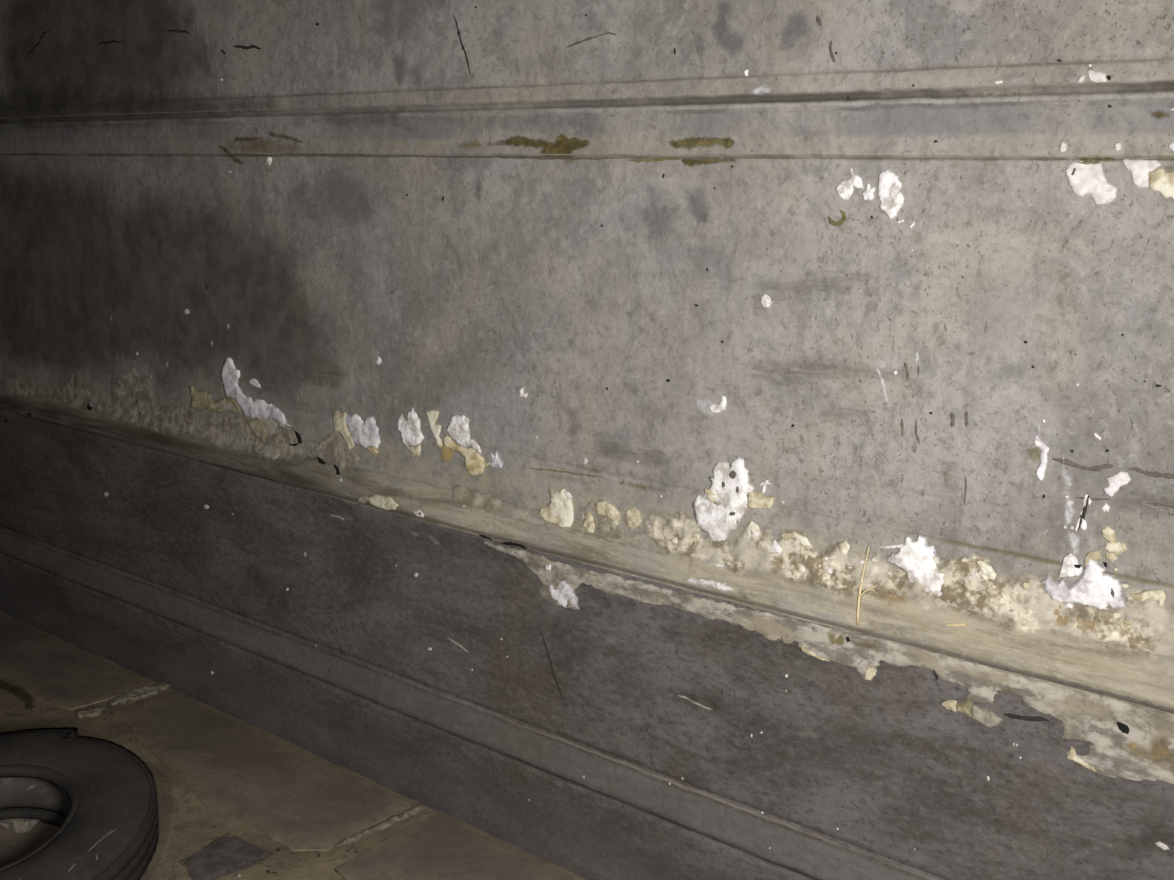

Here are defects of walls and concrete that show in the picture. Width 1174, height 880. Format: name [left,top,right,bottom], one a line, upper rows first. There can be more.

water stain [0,0,213,124]
peeling [836,168,914,228]
peeling [1065,161,1117,205]
peeling [1122,159,1174,200]
water stain [0,176,312,380]
flaking render [50,357,381,470]
flaking render [397,408,490,476]
flaking render [539,489,642,538]
peeling [1101,471,1131,512]
flaking render [484,541,1174,785]